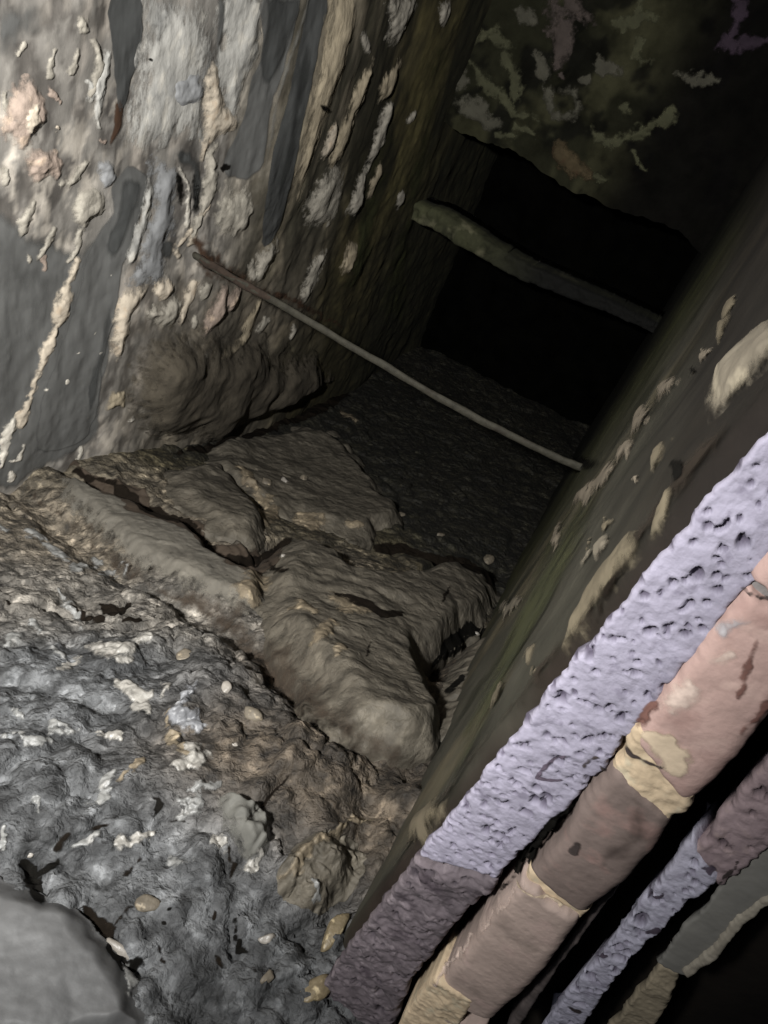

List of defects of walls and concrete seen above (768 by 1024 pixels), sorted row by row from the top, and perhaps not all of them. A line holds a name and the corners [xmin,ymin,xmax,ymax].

leakage [108,0,143,144]
leakage [224,0,327,246]
leakage [179,168,191,228]
rust [193,239,247,282]
leakage [351,175,377,285]
leakage [0,166,147,487]
leakage [235,465,326,530]
leakage [345,519,364,529]
leakage [632,432,721,546]